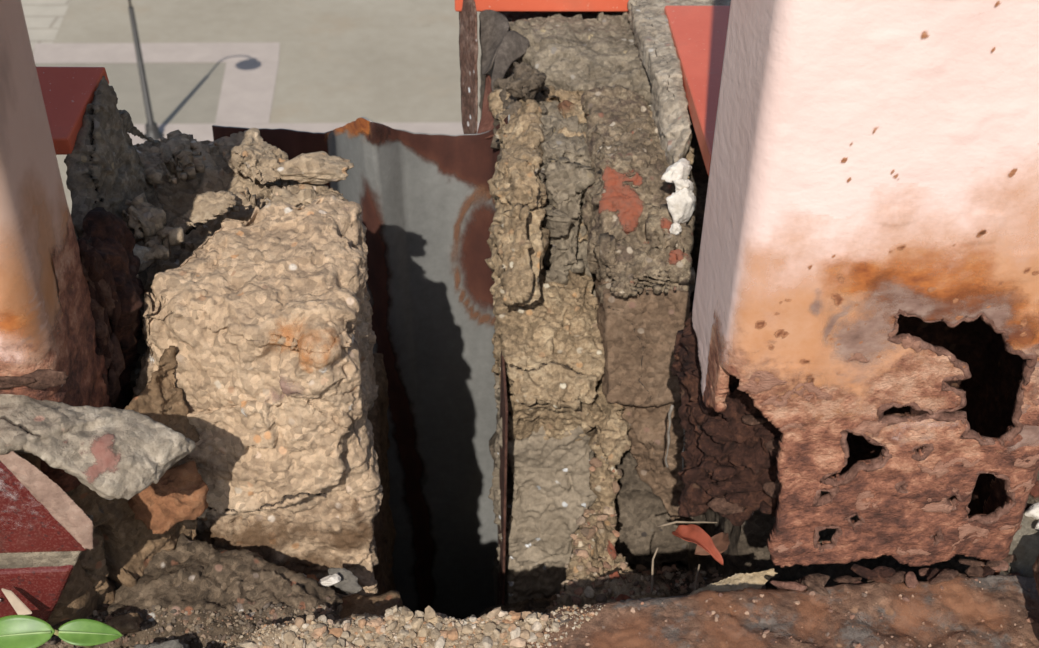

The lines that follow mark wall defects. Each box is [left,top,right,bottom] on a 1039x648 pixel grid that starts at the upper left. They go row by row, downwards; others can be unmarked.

corrosion [0,0,145,409]
corrosion [212,116,508,325]
crack [0,416,41,438]
corrosion [40,460,81,492]
corrosion [671,207,1039,596]